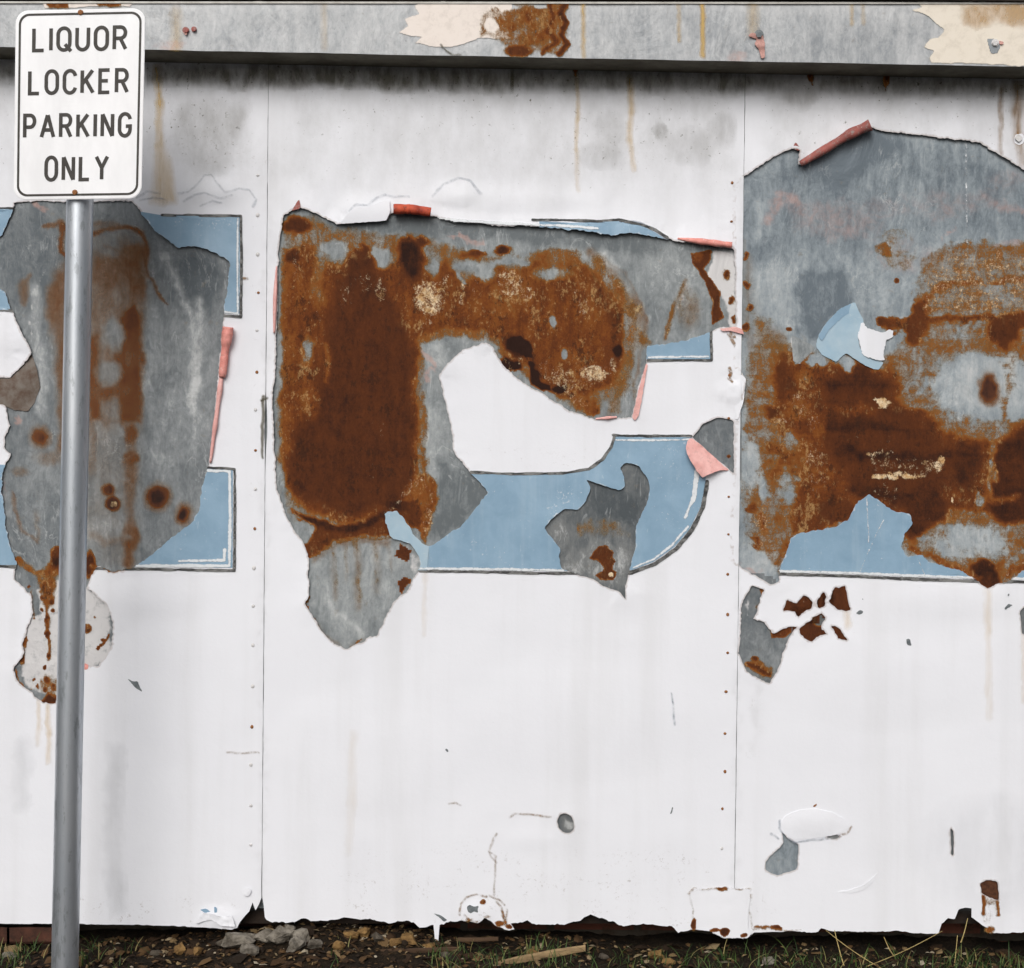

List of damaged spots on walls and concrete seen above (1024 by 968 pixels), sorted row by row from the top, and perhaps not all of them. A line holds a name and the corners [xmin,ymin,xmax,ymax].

peeling [400,4,571,58]
peeling [913,4,1024,67]
peeling [0,201,66,700]
rust [15,546,59,704]
peeling [84,577,113,670]
rust [90,225,167,491]
peeling [87,201,234,572]
rust [276,214,651,562]
rust [590,545,617,581]
peeling [265,120,1024,683]
rust [769,627,792,638]
rust [691,229,1024,588]